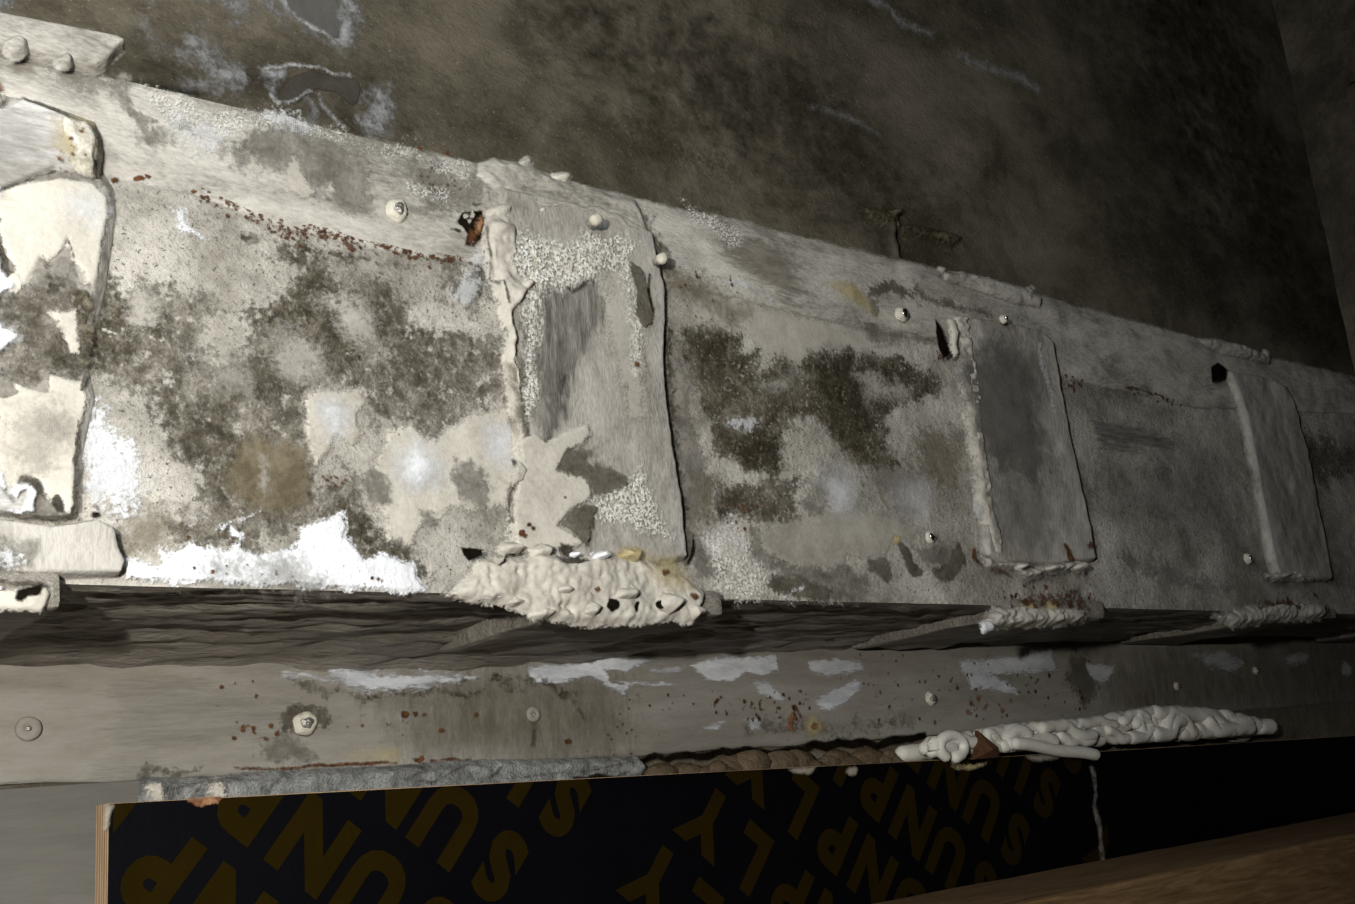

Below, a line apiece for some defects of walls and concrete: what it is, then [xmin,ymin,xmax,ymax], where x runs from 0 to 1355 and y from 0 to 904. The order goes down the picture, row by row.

peeling [0,99,109,293]
water stain [176,208,205,239]
corrosion [191,188,473,269]
water stain [683,199,799,299]
peeling [0,325,17,348]
peeling [0,373,88,514]
water stain [0,215,992,604]
water stain [961,342,1042,482]
spalling [0,579,50,613]
water stain [232,654,784,763]
water stain [808,658,864,711]